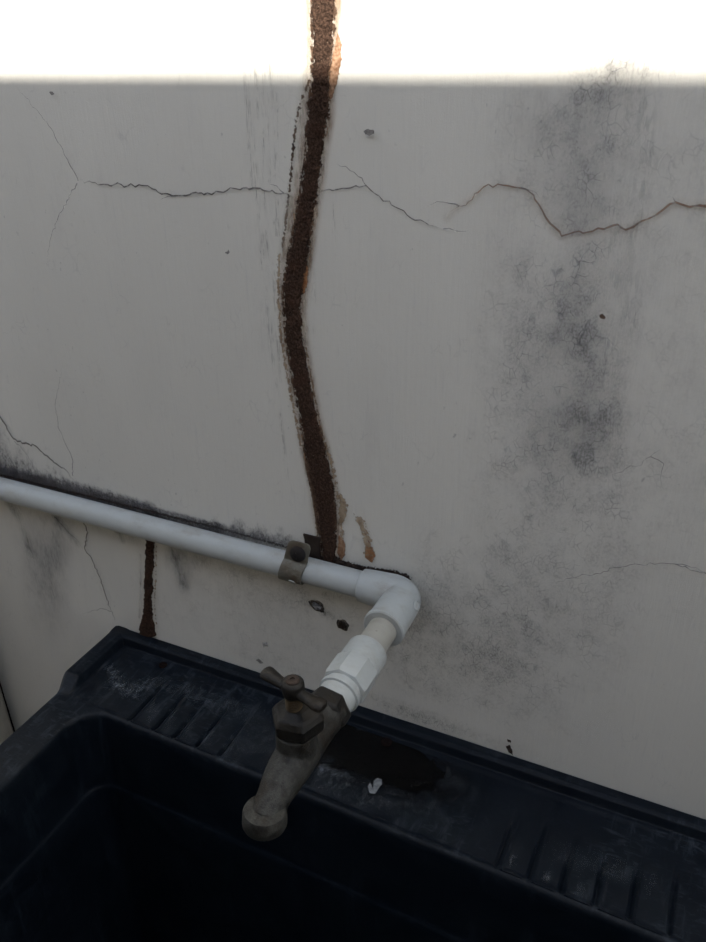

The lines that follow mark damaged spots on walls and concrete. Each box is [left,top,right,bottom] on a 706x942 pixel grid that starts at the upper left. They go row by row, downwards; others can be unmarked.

leakage [331,0,341,62]
crack [33,107,284,250]
crack [329,166,706,237]
crack [0,381,73,475]
leakage [0,463,290,548]
corrosion [353,513,375,563]